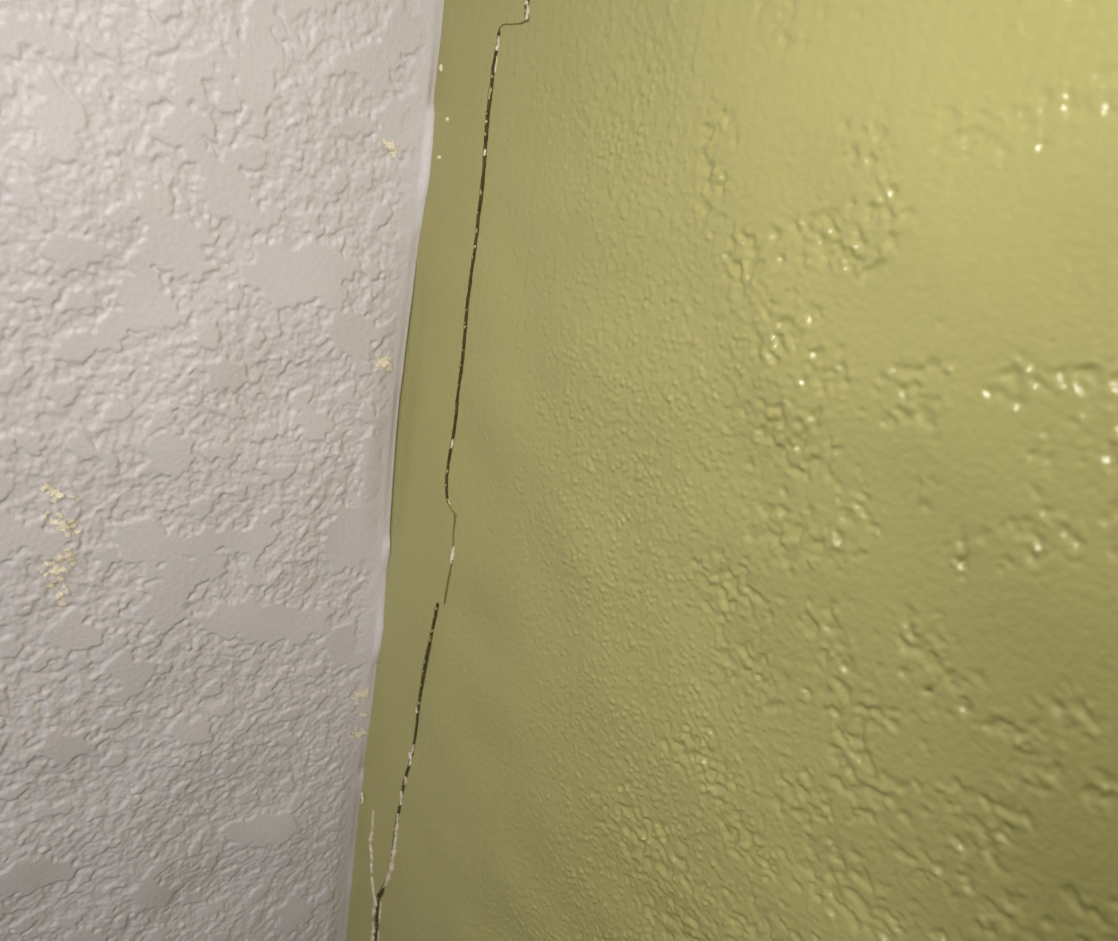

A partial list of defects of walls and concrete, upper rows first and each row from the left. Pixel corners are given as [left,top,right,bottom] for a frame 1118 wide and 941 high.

crack [368,0,529,941]